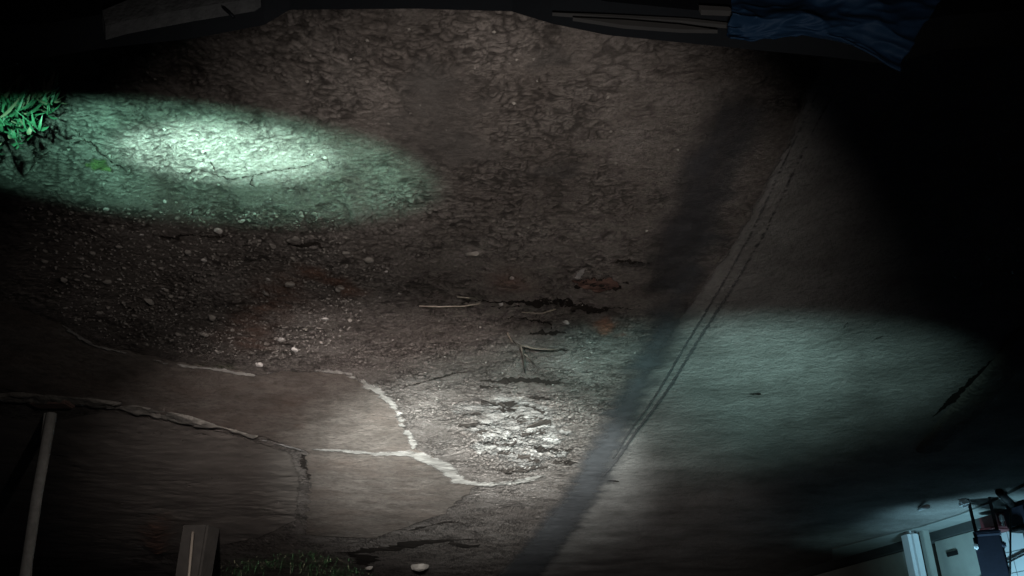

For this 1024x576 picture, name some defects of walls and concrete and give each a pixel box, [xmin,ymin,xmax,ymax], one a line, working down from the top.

crack [460,297,631,351]
water stain [156,360,256,377]
crack [407,372,570,386]
crack [934,349,1002,416]
water stain [279,370,544,487]
spalling [456,385,577,474]
crack [300,451,311,480]
crack [337,521,482,567]